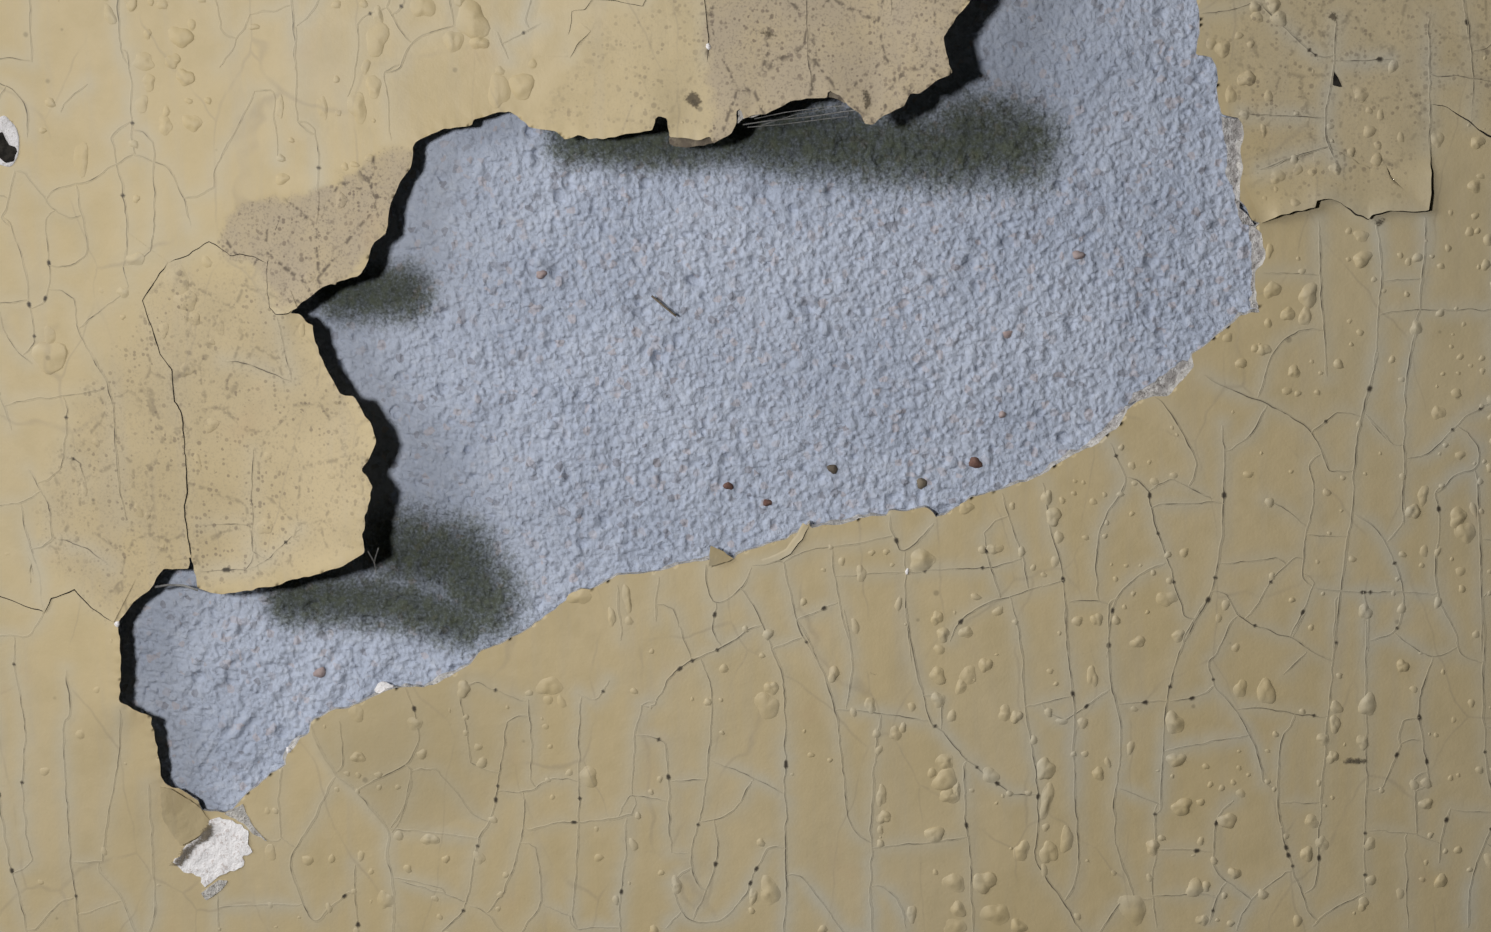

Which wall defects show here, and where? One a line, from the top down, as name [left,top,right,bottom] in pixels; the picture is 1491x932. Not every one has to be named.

crack [804,0,812,89]
crack [1201,1,1393,170]
crack [1427,0,1491,152]
peeling [1243,123,1433,223]
peeling [118,0,1266,900]
crack [217,217,1491,932]